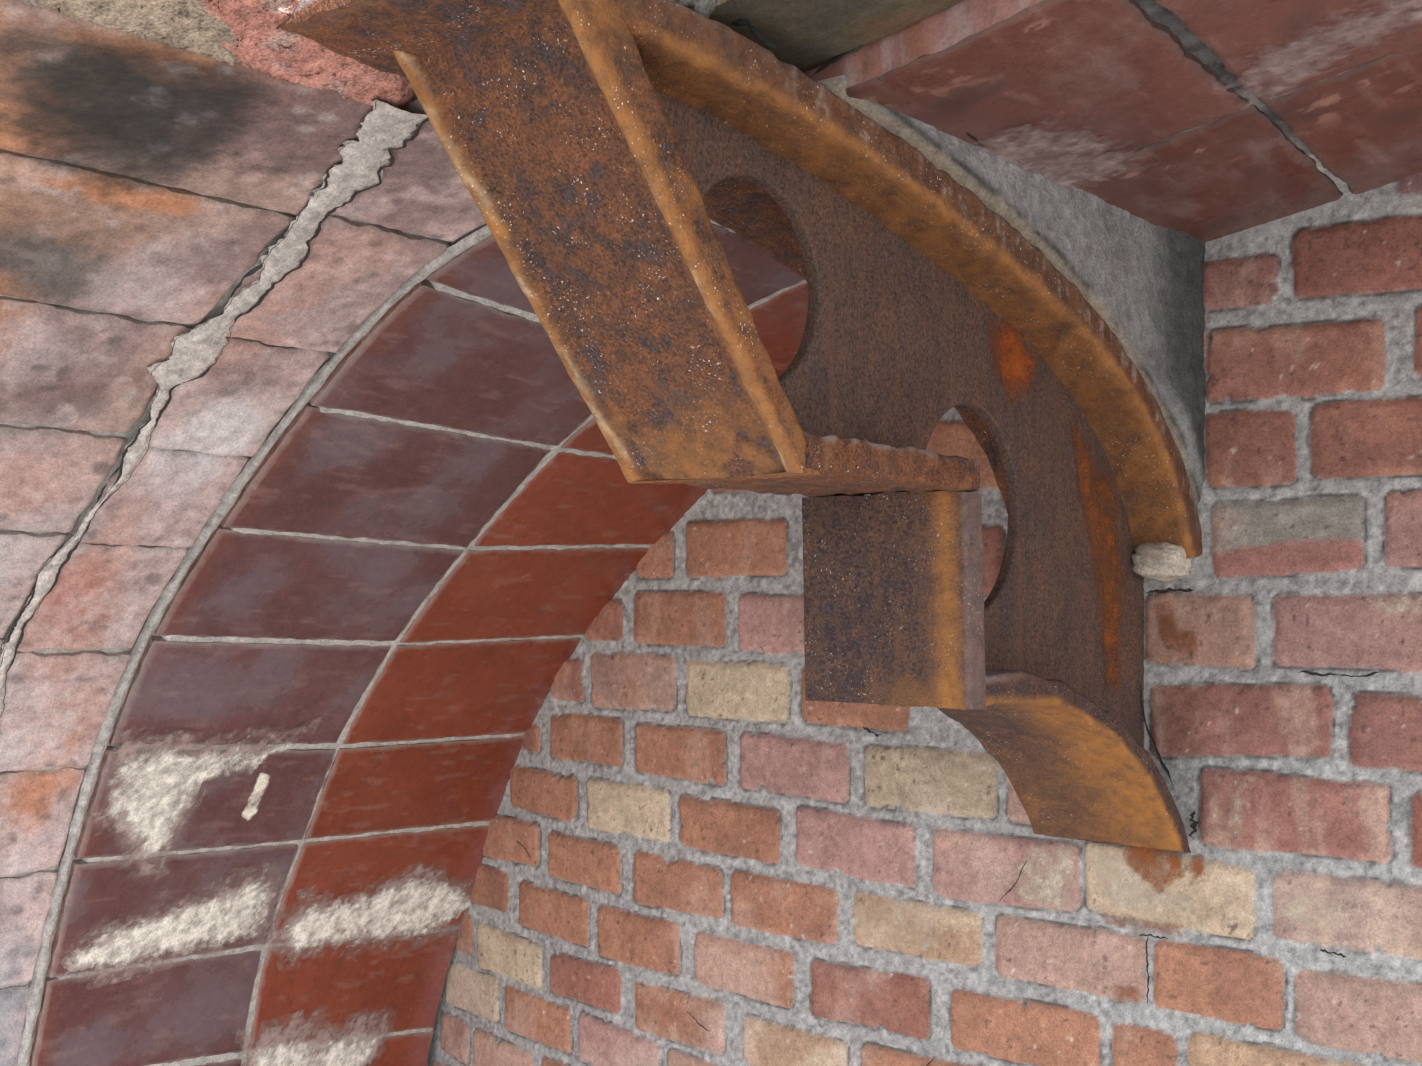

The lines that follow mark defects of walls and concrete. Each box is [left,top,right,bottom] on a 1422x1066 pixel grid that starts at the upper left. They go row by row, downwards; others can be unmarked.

spalling [17,0,415,109]
spalling [671,0,720,18]
crack [0,99,429,717]
rust [996,327,1035,390]
rust [1074,437,1123,682]
leakage [92,720,319,876]
leakage [62,864,472,983]
leakage [237,1010,390,1066]